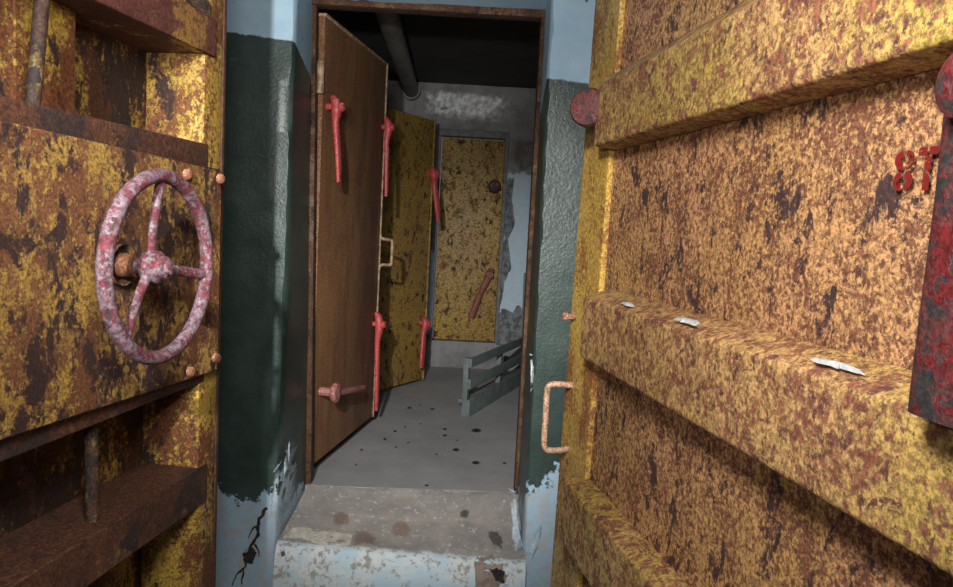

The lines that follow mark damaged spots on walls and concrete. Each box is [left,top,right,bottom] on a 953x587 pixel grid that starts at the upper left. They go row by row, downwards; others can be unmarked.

crack [232,507,268,586]
spalling [474,488,542,587]